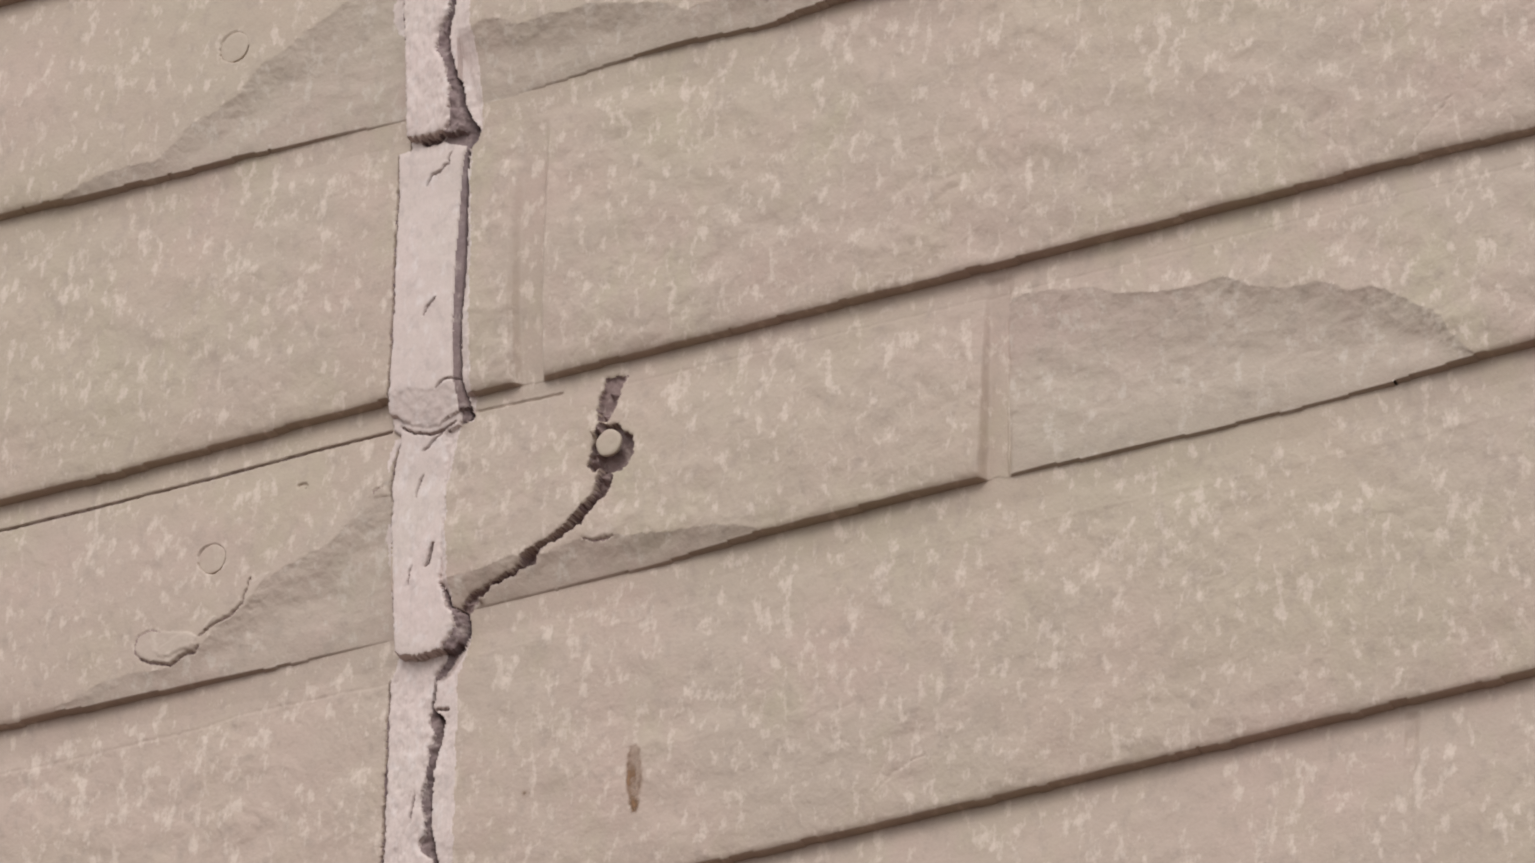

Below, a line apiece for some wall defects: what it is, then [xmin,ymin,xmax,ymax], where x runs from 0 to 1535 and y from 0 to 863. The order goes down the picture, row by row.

crack [403,0,482,489]
crack [459,375,634,616]
crack [410,669,451,863]